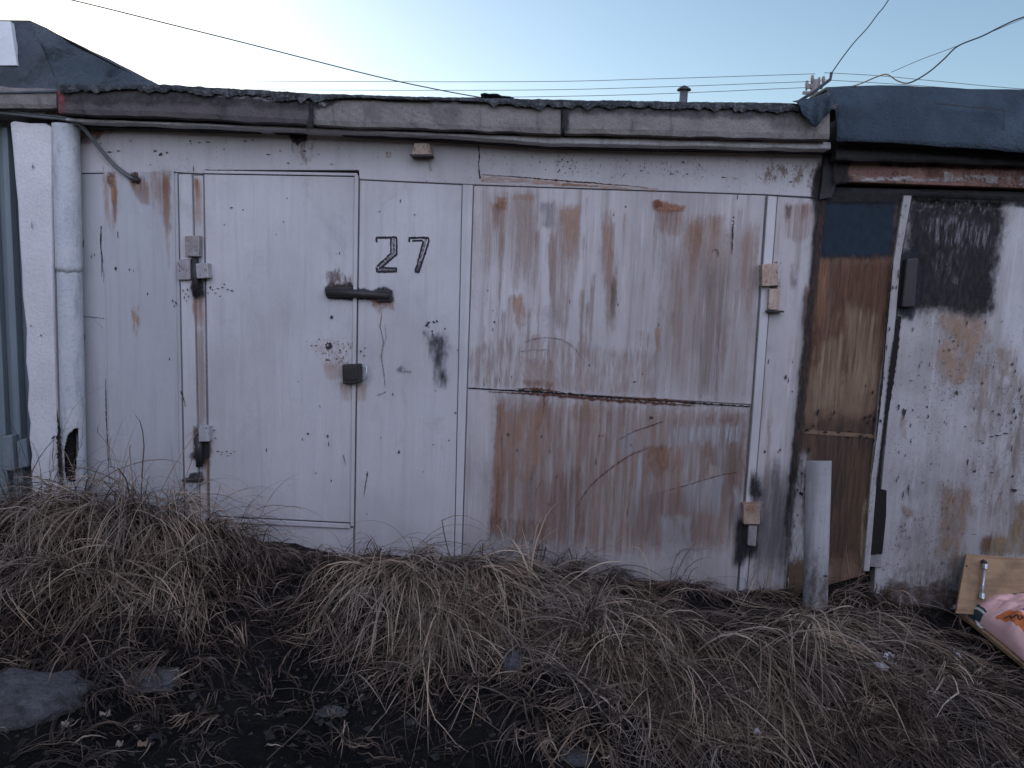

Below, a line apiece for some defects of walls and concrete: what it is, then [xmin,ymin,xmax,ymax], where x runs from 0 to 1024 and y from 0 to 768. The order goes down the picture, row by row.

corrosion [107,173,117,208]
corrosion [512,179,626,314]
corrosion [645,188,685,212]
corrosion [491,402,741,551]
corrosion [801,409,877,560]